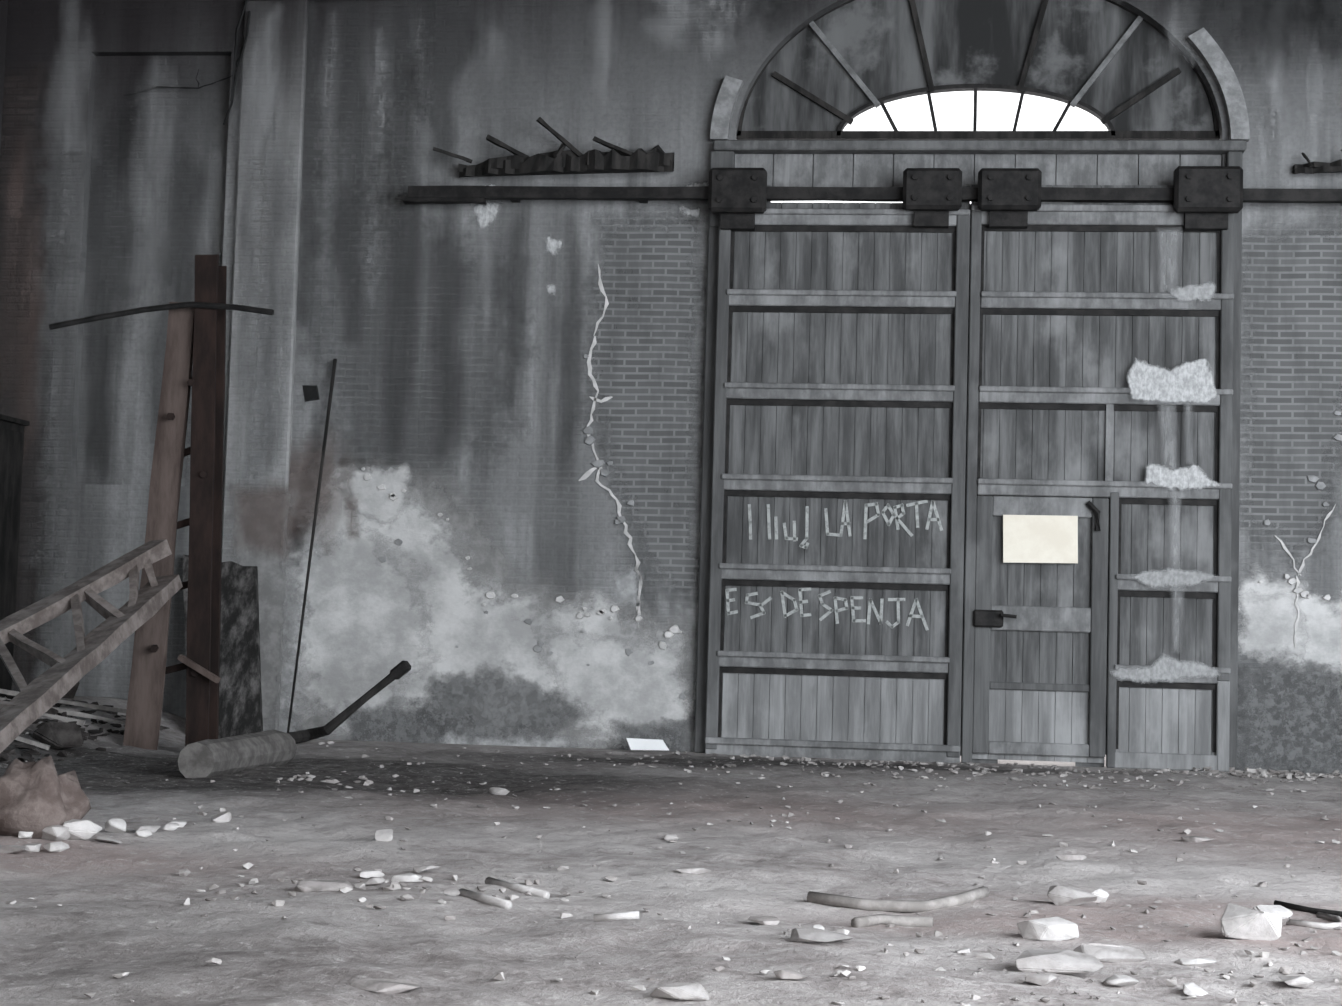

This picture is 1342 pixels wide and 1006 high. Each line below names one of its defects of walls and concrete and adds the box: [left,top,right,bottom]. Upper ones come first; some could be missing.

leakage [474,203,498,228]
leakage [680,206,700,218]
leakage [547,237,562,255]
leakage [1171,283,1215,301]
leakage [1127,359,1217,403]
crack [579,264,643,628]
crack [1275,504,1336,647]
peeling [279,460,691,750]
leakage [1237,664,1342,774]